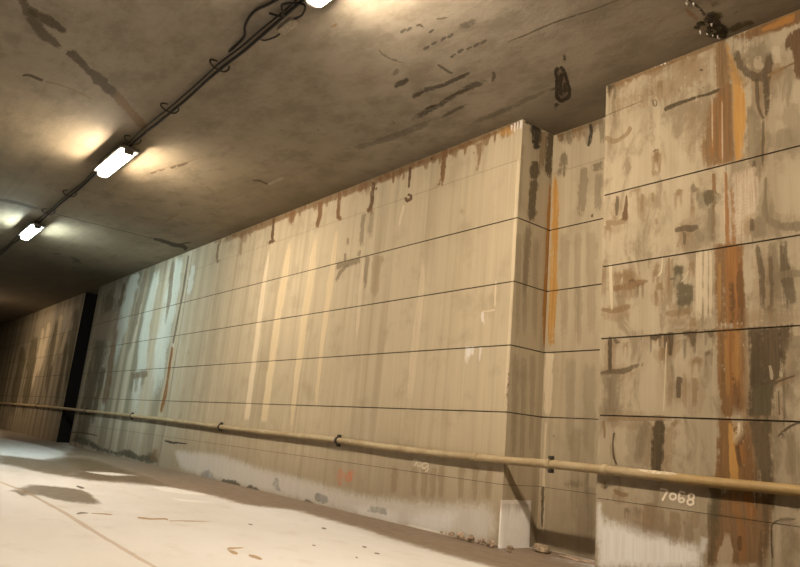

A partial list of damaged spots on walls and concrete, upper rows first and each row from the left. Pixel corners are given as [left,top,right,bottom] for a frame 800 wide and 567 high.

corrosion [315,201,324,229]
corrosion [335,192,343,222]
corrosion [358,182,378,248]
corrosion [402,167,413,203]
corrosion [436,149,448,187]
corrosion [474,124,517,174]
corrosion [699,10,800,481]
water stain [172,21,800,567]
corrosion [542,173,560,417]
corrosion [159,254,189,415]
water stain [0,255,221,505]
corrosion [705,489,771,567]